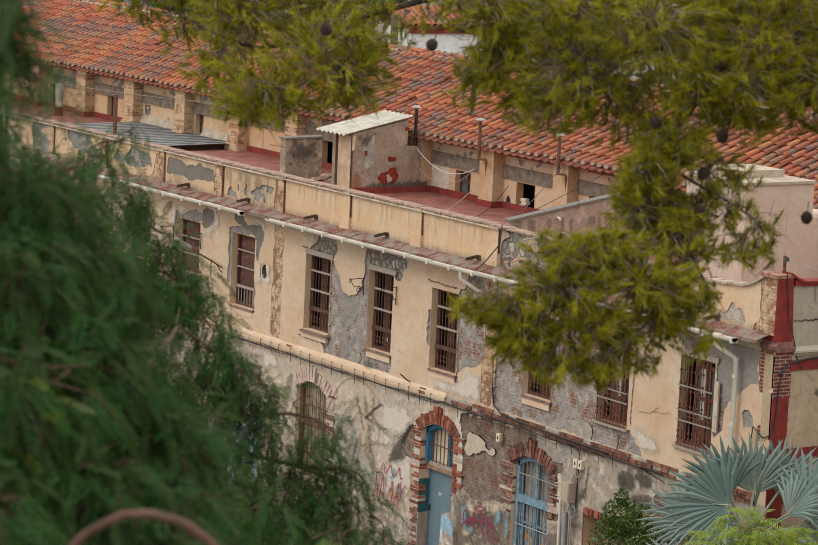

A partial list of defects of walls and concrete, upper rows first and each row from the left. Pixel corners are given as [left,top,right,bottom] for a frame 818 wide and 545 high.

flaking render [227,178,278,209]
flaking render [378,157,399,186]
flaking render [310,236,408,373]
flaking render [719,277,778,336]
flaking render [455,275,641,456]
flaking render [460,413,537,513]
flaking render [547,462,564,522]